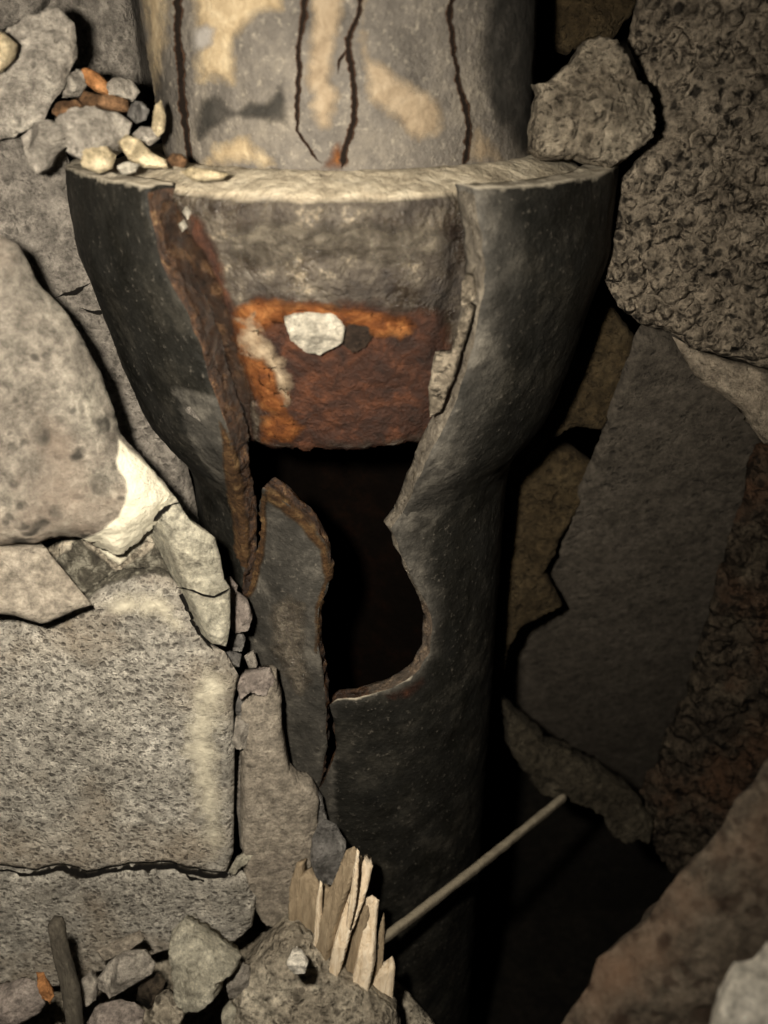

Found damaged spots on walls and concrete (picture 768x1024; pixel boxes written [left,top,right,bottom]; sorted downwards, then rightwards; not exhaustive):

crack [172,0,193,163]
crack [294,0,362,168]
crack [445,0,472,165]
corrosion [160,199,448,654]
crack [0,862,231,882]